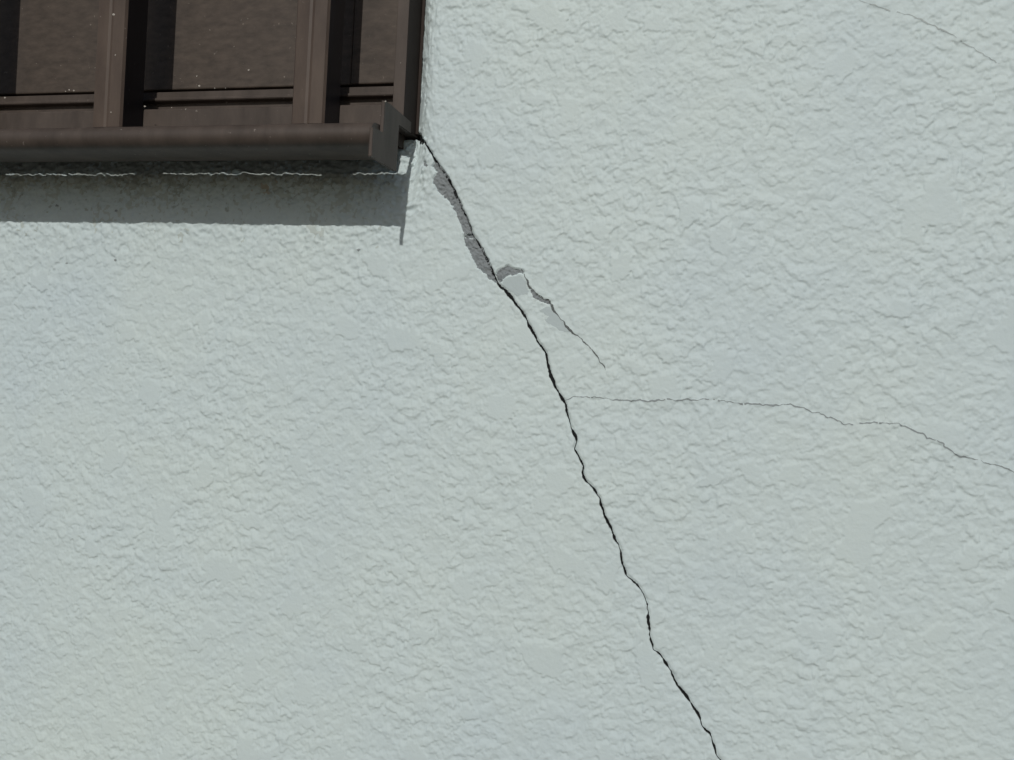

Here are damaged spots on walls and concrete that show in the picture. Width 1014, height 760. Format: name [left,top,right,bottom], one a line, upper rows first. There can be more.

spalling [424,163,570,332]
crack [420,134,1013,760]